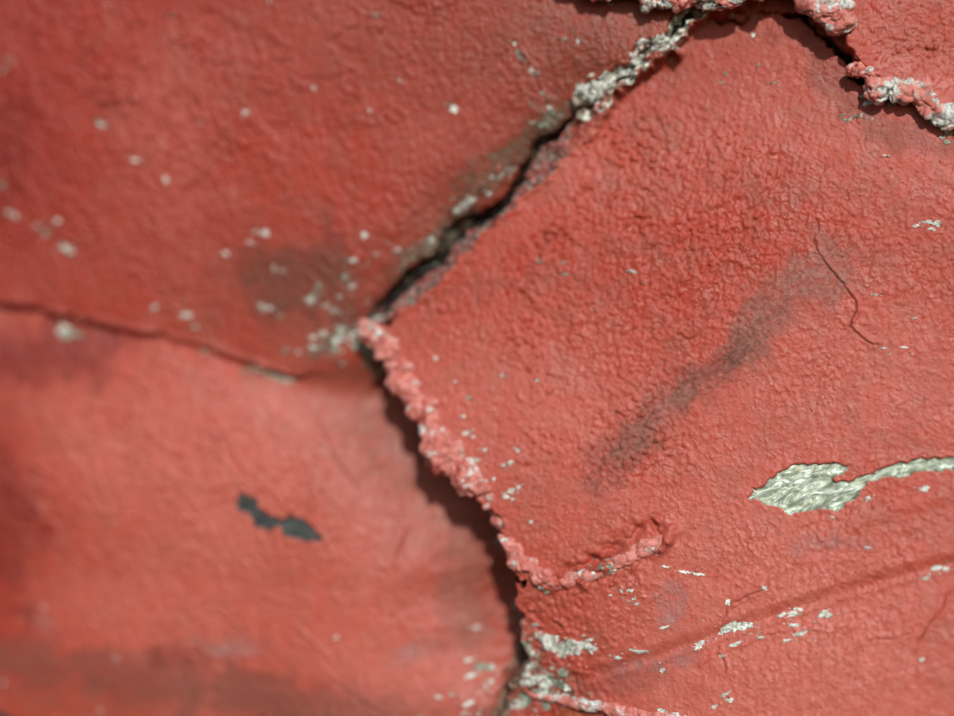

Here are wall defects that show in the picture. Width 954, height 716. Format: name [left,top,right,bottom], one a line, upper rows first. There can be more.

crack [371,6,865,325]
crack [813,223,871,344]
peeling [237,494,323,542]
peeling [748,457,954,519]
crack [516,576,527,619]